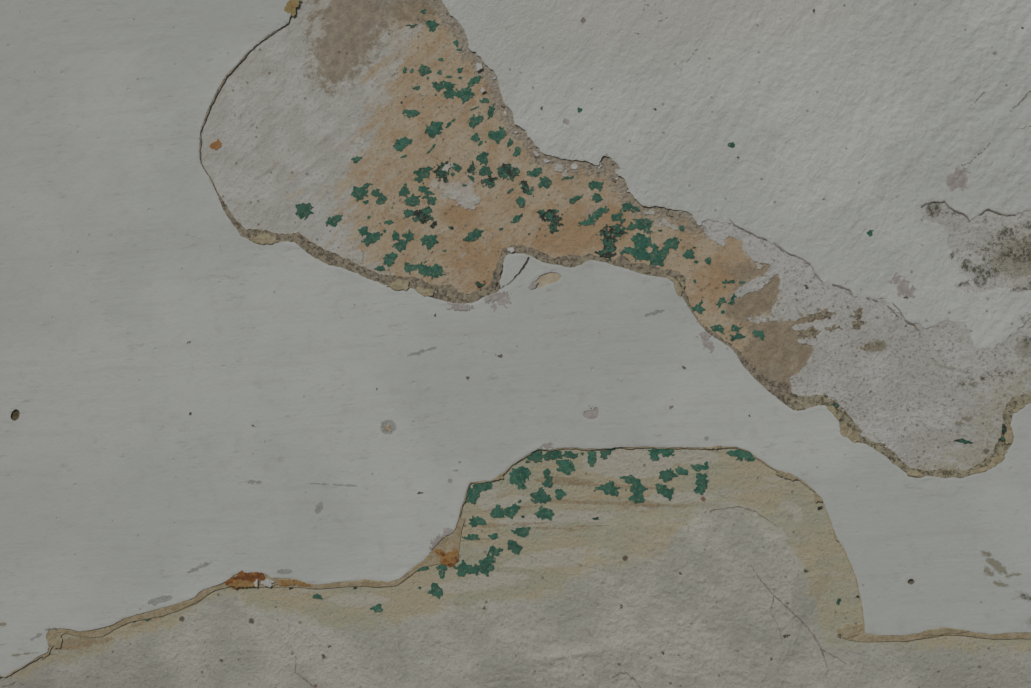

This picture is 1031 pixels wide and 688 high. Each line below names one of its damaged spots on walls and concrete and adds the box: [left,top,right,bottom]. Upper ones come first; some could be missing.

peeling [199,0,1031,478]
peeling [0,441,1031,688]